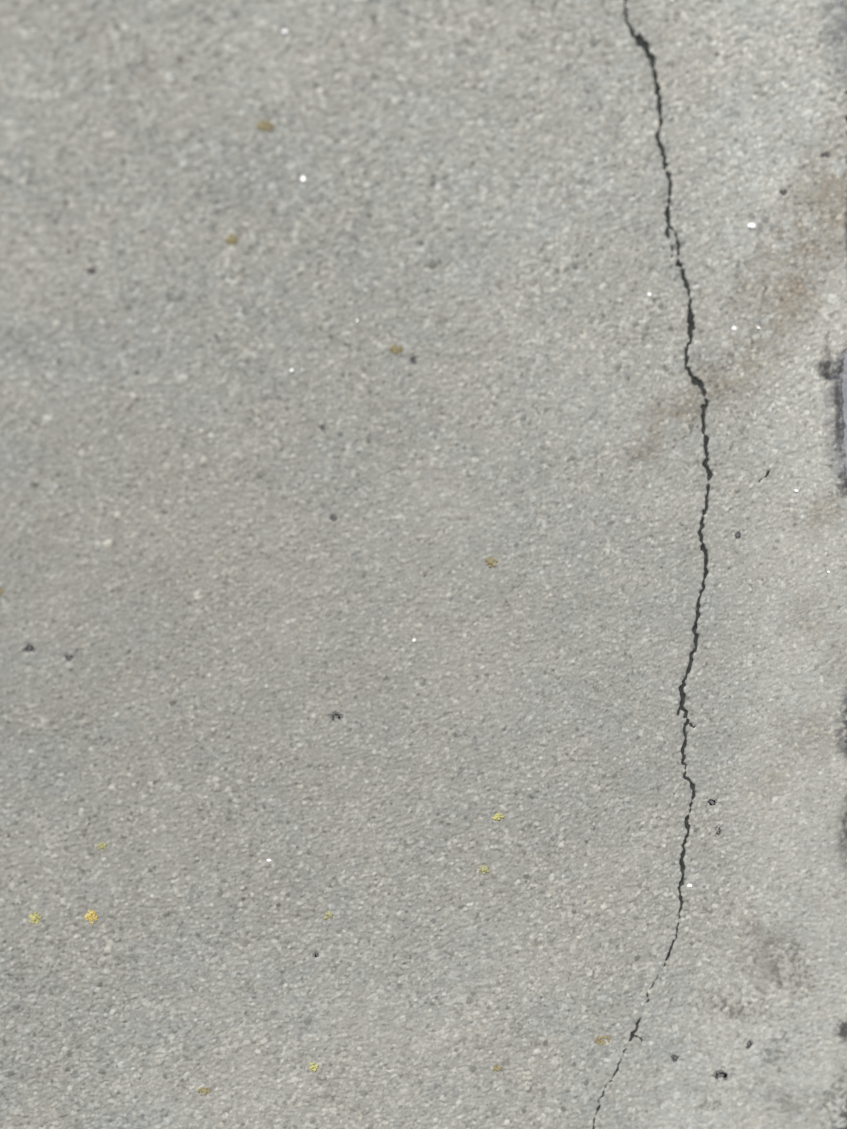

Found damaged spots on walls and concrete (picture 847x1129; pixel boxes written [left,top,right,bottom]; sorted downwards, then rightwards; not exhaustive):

crack [593,0,713,1129]